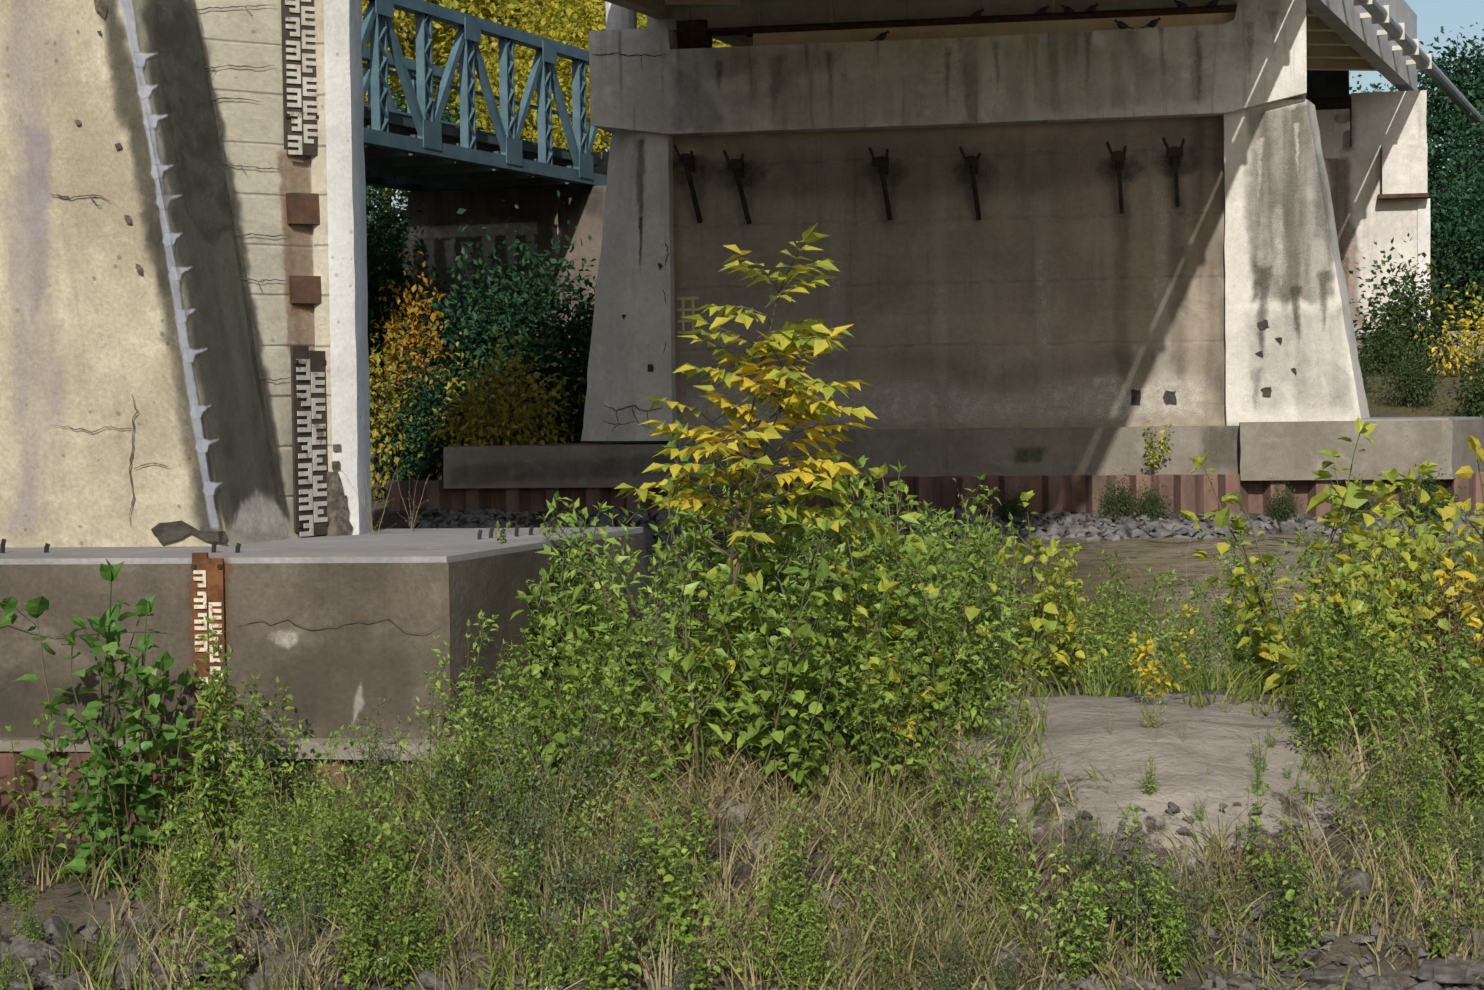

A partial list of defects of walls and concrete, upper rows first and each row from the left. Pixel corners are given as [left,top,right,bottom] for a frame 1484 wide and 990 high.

leakage [104,0,289,537]
leakage [1253,106,1363,341]
spalling [1255,320,1282,358]
crack [50,396,169,527]
crack [603,405,663,432]